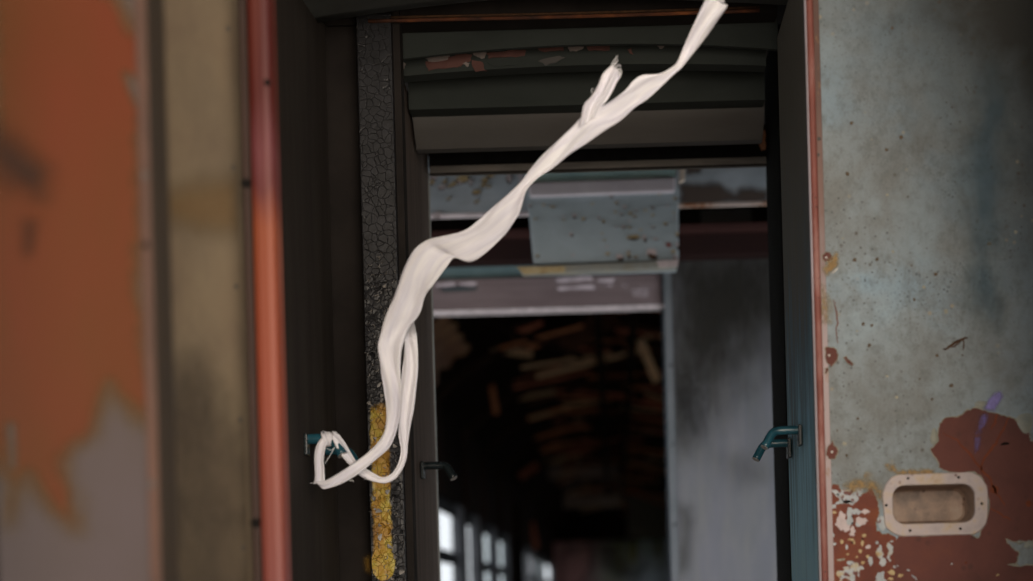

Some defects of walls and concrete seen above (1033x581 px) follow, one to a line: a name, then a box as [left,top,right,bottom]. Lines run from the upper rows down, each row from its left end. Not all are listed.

peeling [425,46,610,72]
peeling [826,440,839,460]
peeling [832,401,1033,581]